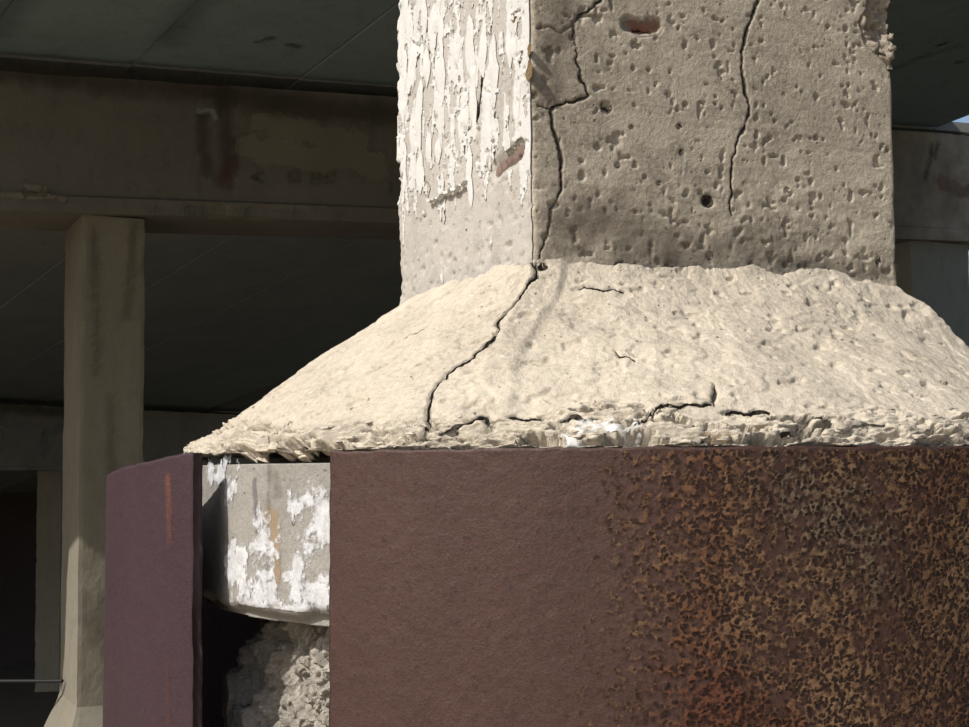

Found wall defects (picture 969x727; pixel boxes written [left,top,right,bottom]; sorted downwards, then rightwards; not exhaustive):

flaking render [396,0,533,305]
crack [407,0,602,442]
crack [580,286,624,294]
rust [627,20,659,34]
crack [728,0,759,213]
spalling [858,0,897,71]
peeling [208,455,240,507]
spalling [222,481,330,727]
rust [604,449,969,727]